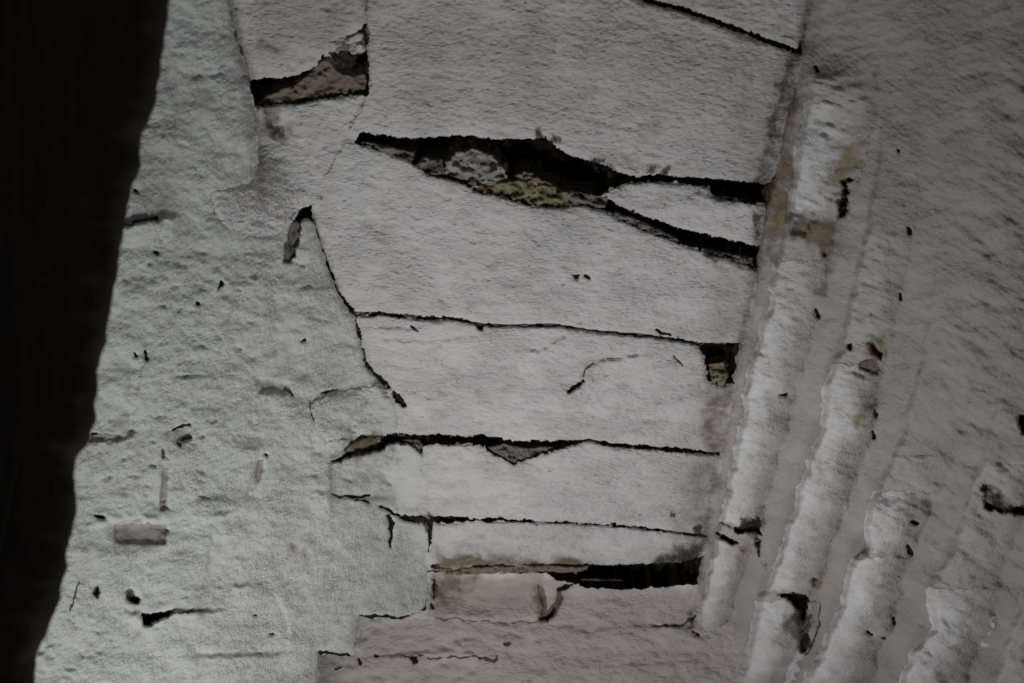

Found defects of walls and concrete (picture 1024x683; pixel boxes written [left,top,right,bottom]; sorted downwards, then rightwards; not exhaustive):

peeling [250,24,369,105]
crack [304,205,704,407]
peeling [705,343,734,387]
crack [729,343,739,372]
crack [309,389,337,425]
crack [331,433,456,462]
crack [482,434,565,463]
peeling [114,522,167,544]
crack [716,518,762,557]
crack [318,494,702,670]
crack [170,607,204,615]